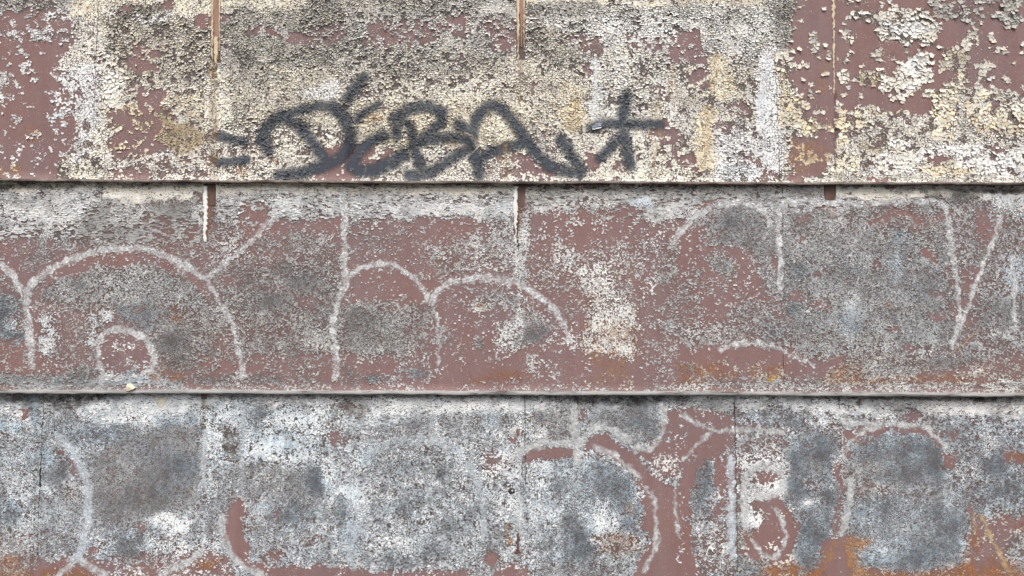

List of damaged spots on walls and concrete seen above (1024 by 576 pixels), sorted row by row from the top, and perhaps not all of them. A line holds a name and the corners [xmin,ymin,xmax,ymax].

peeling [809,30,831,60]
peeling [986,32,1010,55]
peeling [0,52,25,114]
peeling [0,142,25,179]